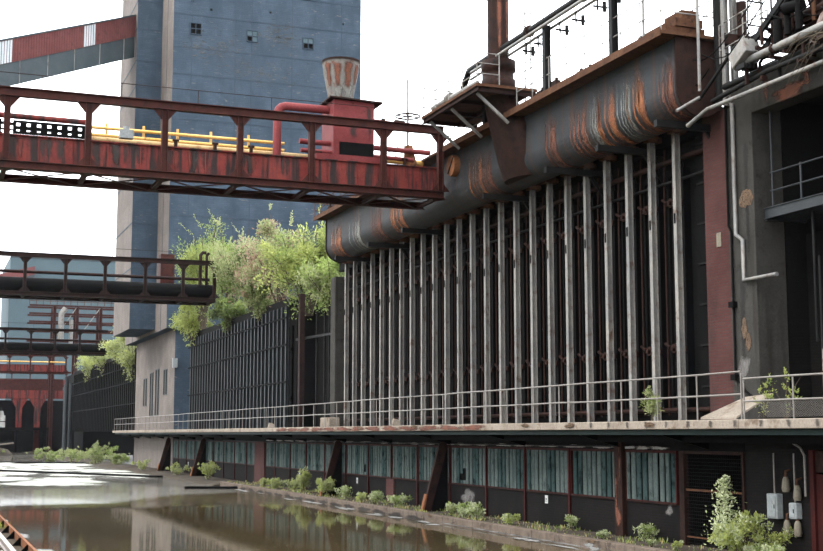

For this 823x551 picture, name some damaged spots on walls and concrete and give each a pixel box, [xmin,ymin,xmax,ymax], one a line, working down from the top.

rust [497,0,508,48]
rust [325,62,359,87]
rust [545,66,703,169]
spalling [739,189,753,208]
rust [372,199,412,243]
spalling [741,318,752,351]